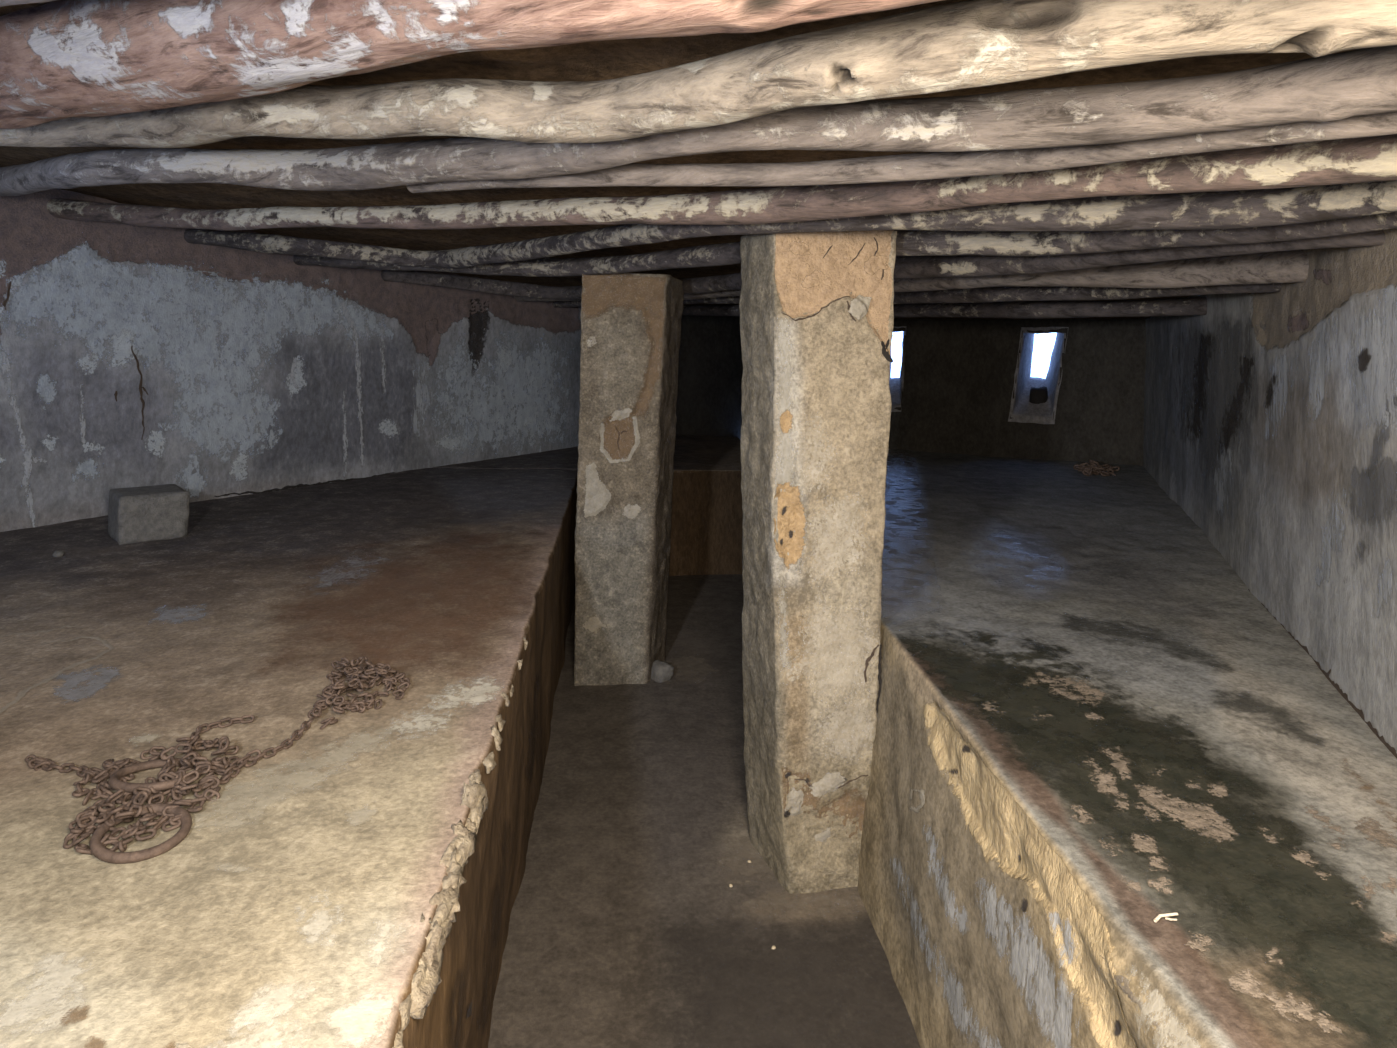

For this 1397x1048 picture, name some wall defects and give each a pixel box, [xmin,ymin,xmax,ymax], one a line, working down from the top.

peeling [298,895,343,945]
peeling [0,189,665,519]
spalling [327,637,528,1048]
spalling [774,482,806,569]
water stain [775,319,879,765]
spalling [775,230,894,356]
spalling [923,701,1137,1048]
spalling [1022,672,1107,721]
water stain [890,630,1397,1048]
water stain [1066,616,1231,670]
water stain [1170,284,1397,586]
spalling [1250,228,1397,351]